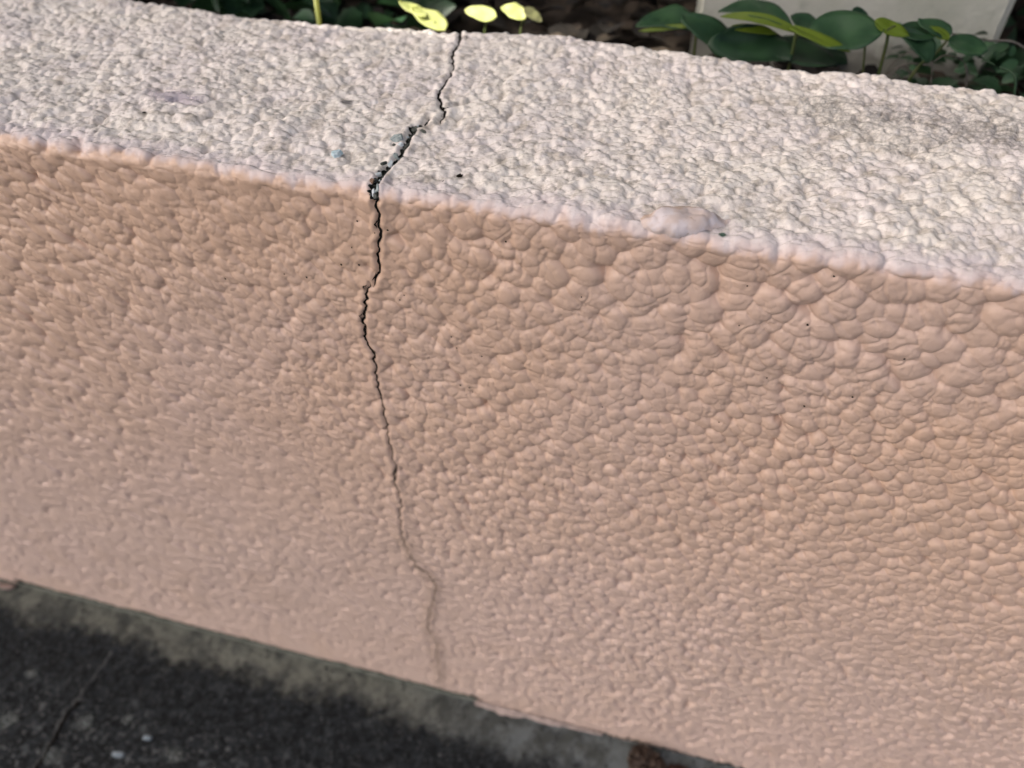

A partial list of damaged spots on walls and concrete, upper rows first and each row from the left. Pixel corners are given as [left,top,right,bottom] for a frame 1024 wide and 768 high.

crack [359,33,467,681]